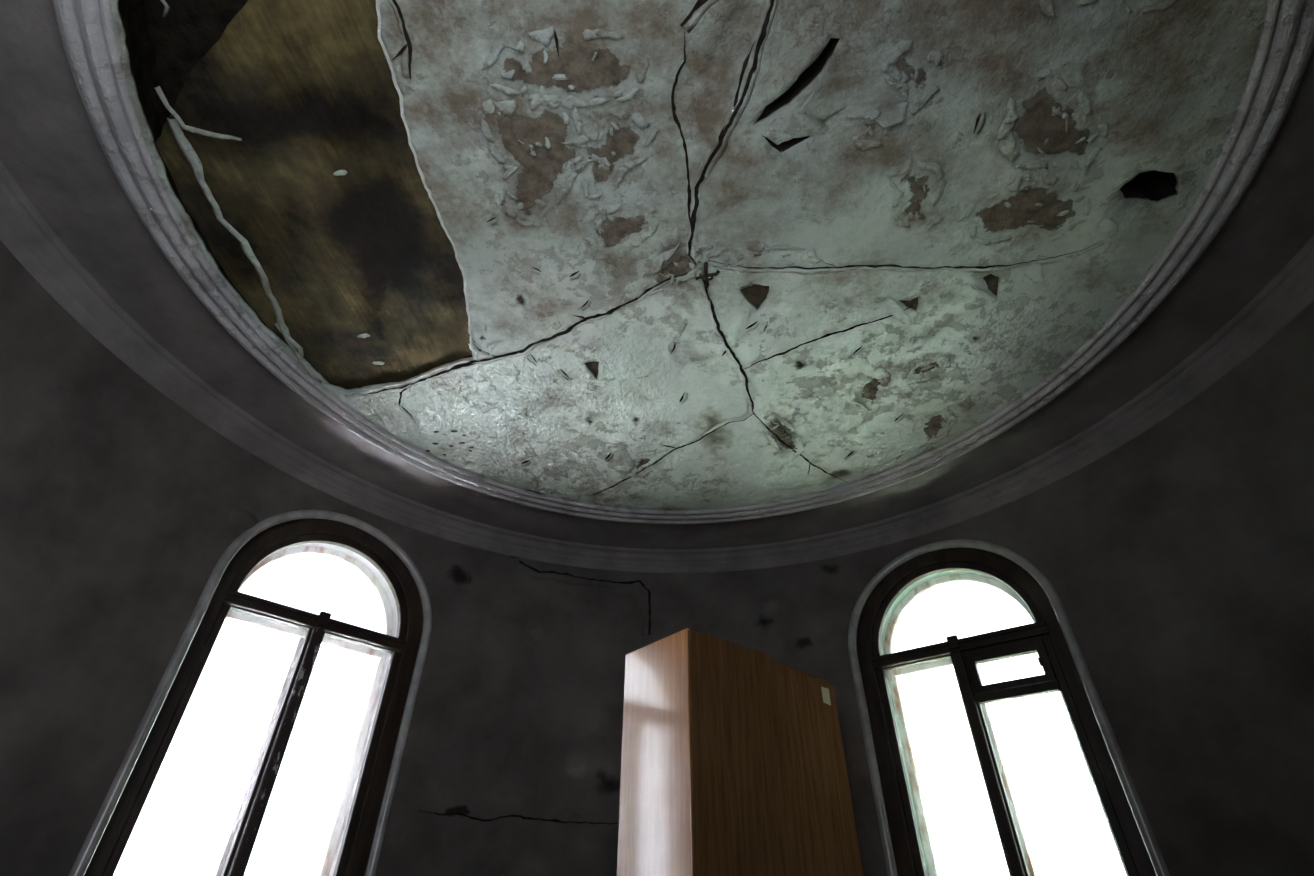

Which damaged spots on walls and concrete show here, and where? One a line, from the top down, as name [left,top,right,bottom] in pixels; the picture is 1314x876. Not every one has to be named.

spalling [119,0,501,390]
crack [344,0,1104,495]
spalling [1120,170,1177,201]